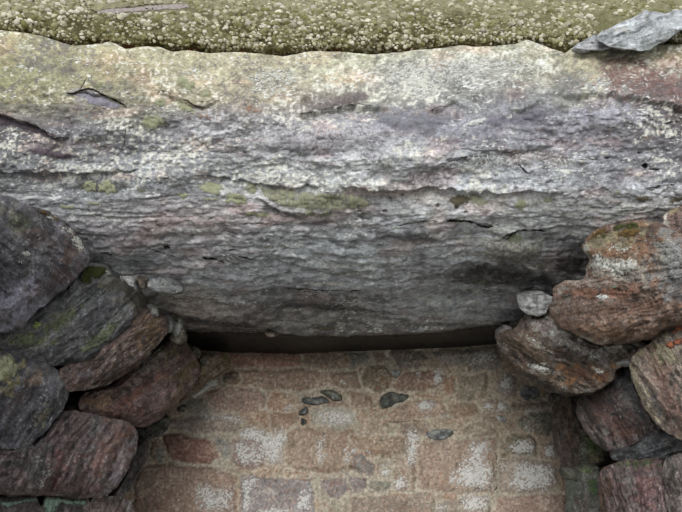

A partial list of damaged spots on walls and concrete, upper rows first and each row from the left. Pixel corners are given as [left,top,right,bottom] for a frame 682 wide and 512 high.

crack [66,79,126,107]
crack [398,219,544,237]